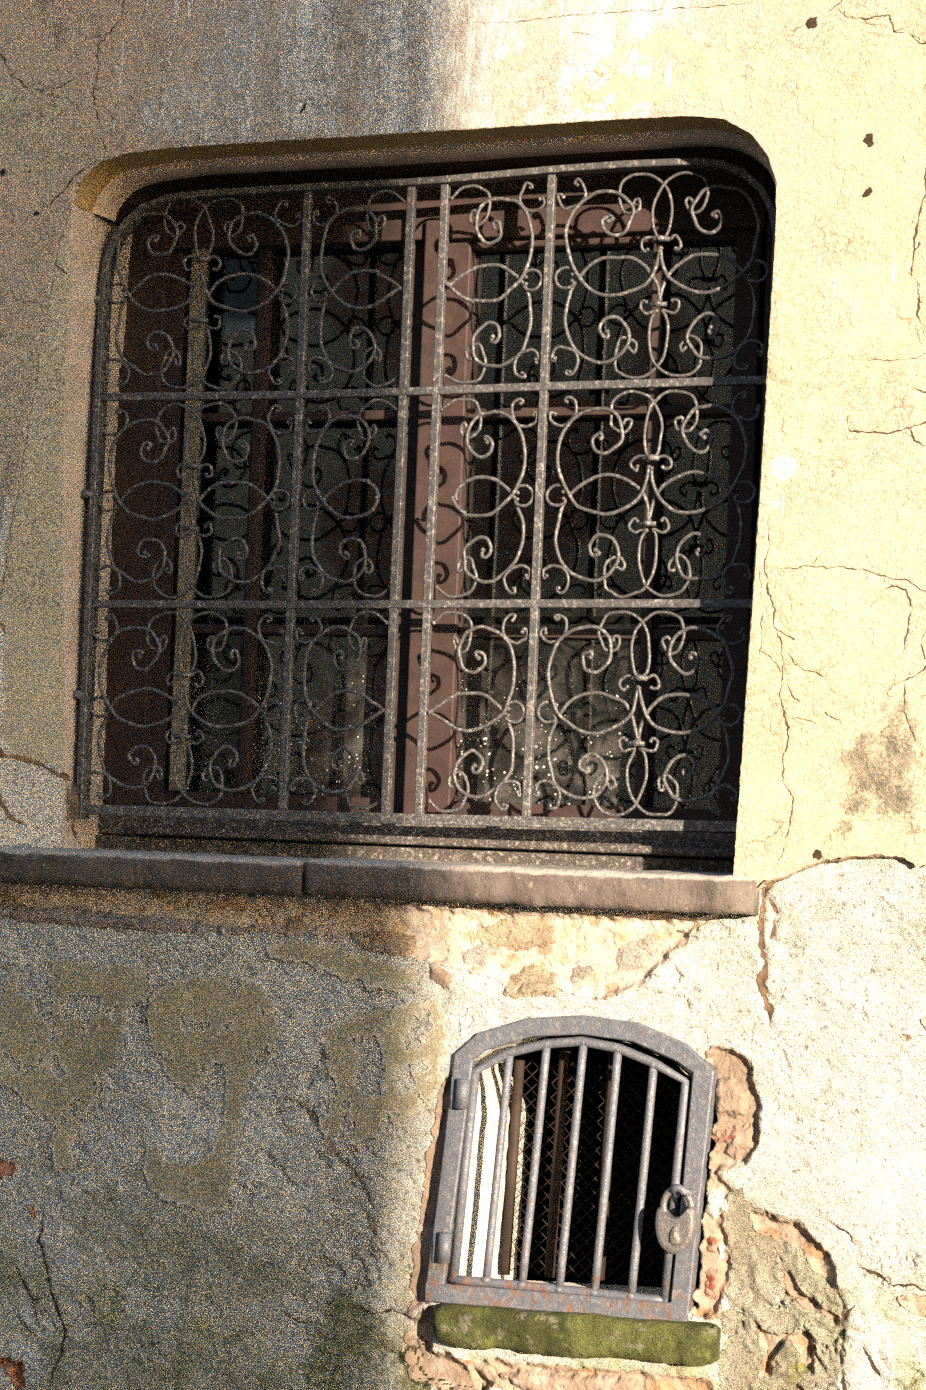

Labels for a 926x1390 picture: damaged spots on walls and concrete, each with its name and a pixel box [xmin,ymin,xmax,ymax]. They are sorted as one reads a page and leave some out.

crack [0,0,128,208]
crack [788,1,926,44]
crack [847,158,926,446]
peeling [561,16,926,892]
crack [0,748,80,844]
crack [756,519,926,1028]
damp [836,702,916,839]
spalling [0,882,849,1390]
crack [17,1219,66,1380]
spalling [897,1294,926,1317]